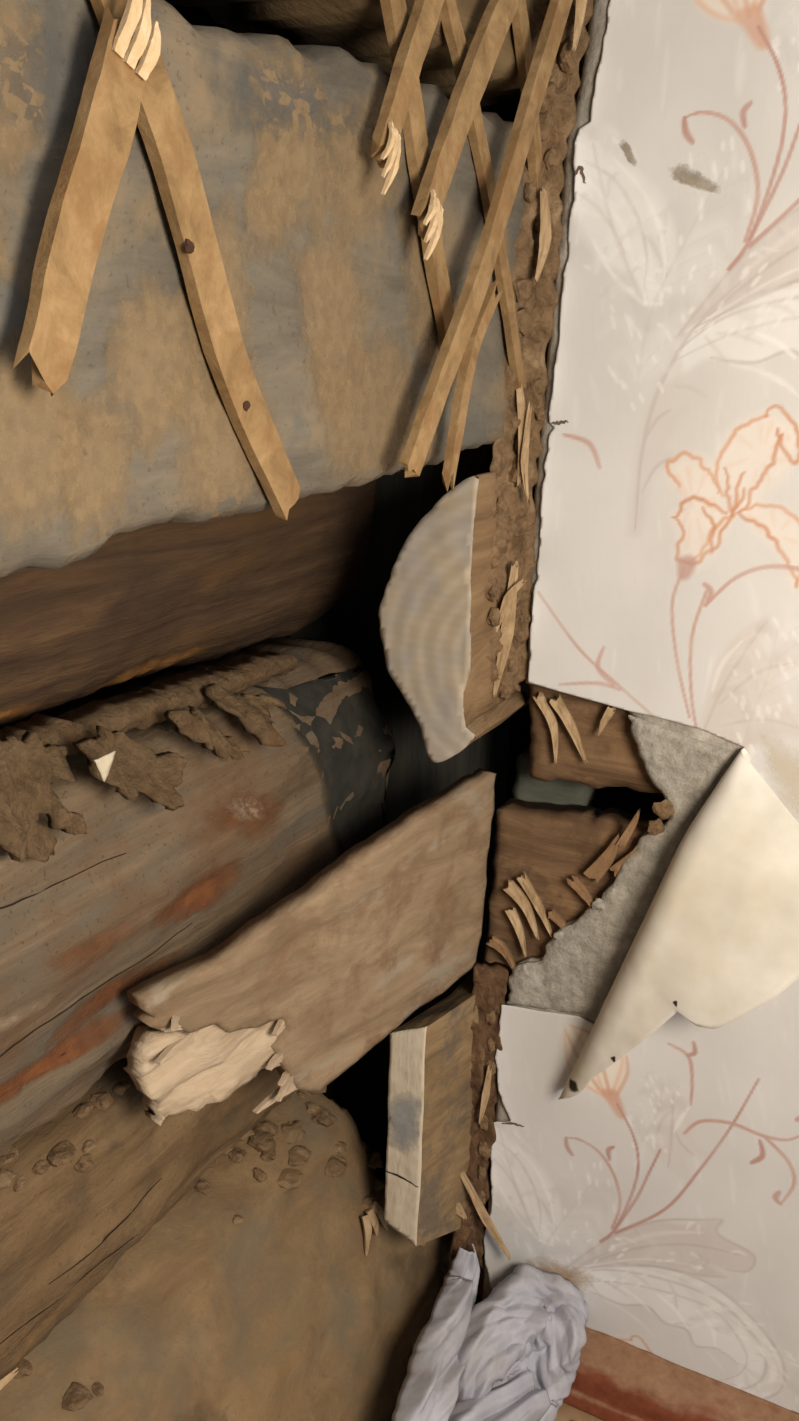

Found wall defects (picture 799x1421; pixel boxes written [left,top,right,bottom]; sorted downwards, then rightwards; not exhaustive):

peeling [621,143,635,164]
peeling [674,167,716,192]
crack [0,853,127,909]
crack [0,923,192,1057]
flaking render [450,714,734,1268]